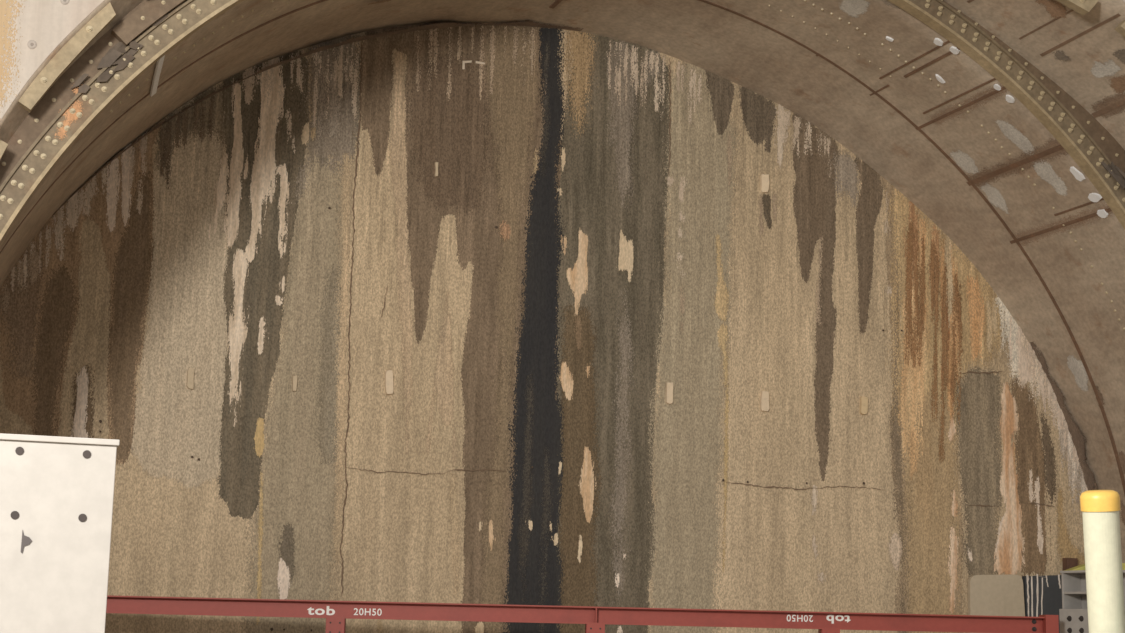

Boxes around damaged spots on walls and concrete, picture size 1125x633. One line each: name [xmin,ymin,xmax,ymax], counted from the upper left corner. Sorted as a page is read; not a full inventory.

corrosion [54,84,84,141]
corrosion [1089,74,1125,118]
spalling [616,230,634,282]
crack [340,40,505,596]
water stain [0,23,930,614]
corrosion [882,185,1008,615]
water stain [995,295,1088,565]
spalling [578,446,596,523]
crack [729,482,881,490]
water stain [925,365,1004,615]
water stain [238,616,326,633]
water stain [605,624,719,633]